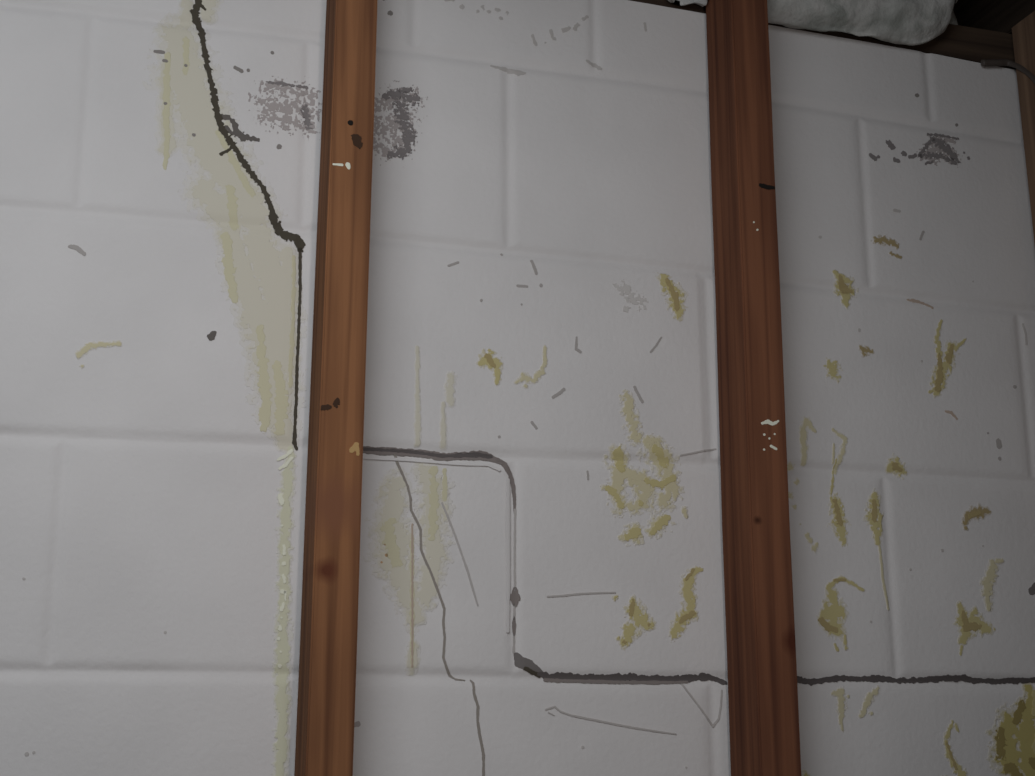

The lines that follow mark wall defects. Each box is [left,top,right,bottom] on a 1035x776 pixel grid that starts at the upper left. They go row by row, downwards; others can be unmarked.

crack [190,0,306,450]
leakage [141,0,308,776]
leakage [600,389,688,547]
crack [363,446,520,776]
crack [547,590,616,598]
leakage [611,594,657,651]
leakage [668,565,704,643]
leakage [817,574,865,652]
leakage [952,558,1004,656]
crack [537,672,727,735]
crack [797,674,1035,686]
leakage [985,682,1035,776]